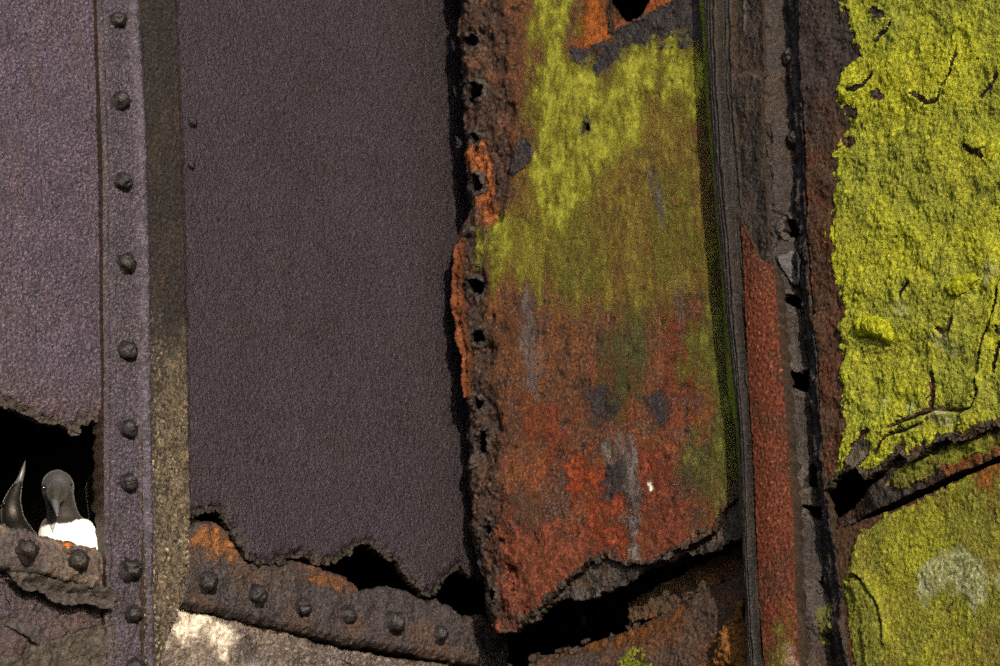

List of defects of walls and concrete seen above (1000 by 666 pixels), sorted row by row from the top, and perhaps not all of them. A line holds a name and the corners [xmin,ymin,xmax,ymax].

rust [464,141,499,224]
rust [450,239,474,400]
rust [493,403,714,631]
rust [697,598,748,666]